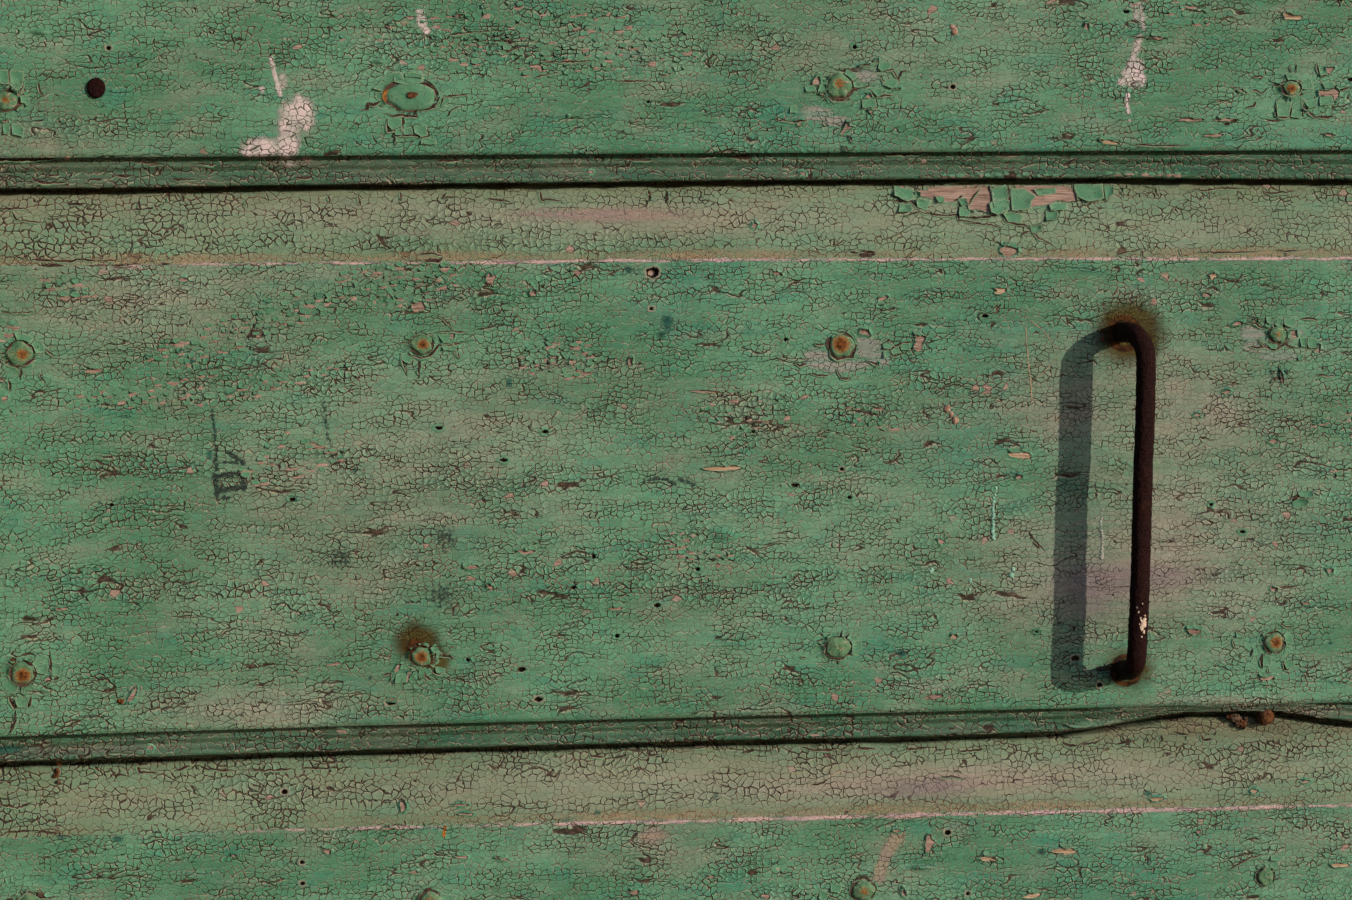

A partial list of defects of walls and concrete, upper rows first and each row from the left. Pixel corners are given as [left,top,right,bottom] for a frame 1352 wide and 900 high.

crack [0,158,217,225]
crack [295,159,567,204]
peeling [889,170,1189,262]
crack [13,255,170,267]
crack [851,249,876,257]
crack [1178,249,1299,258]
peeling [39,271,92,301]
corrosion [1100,304,1159,358]
peeling [0,310,54,403]
corrosion [398,627,447,670]
corrosion [1110,654,1146,687]
crack [1062,731,1217,749]